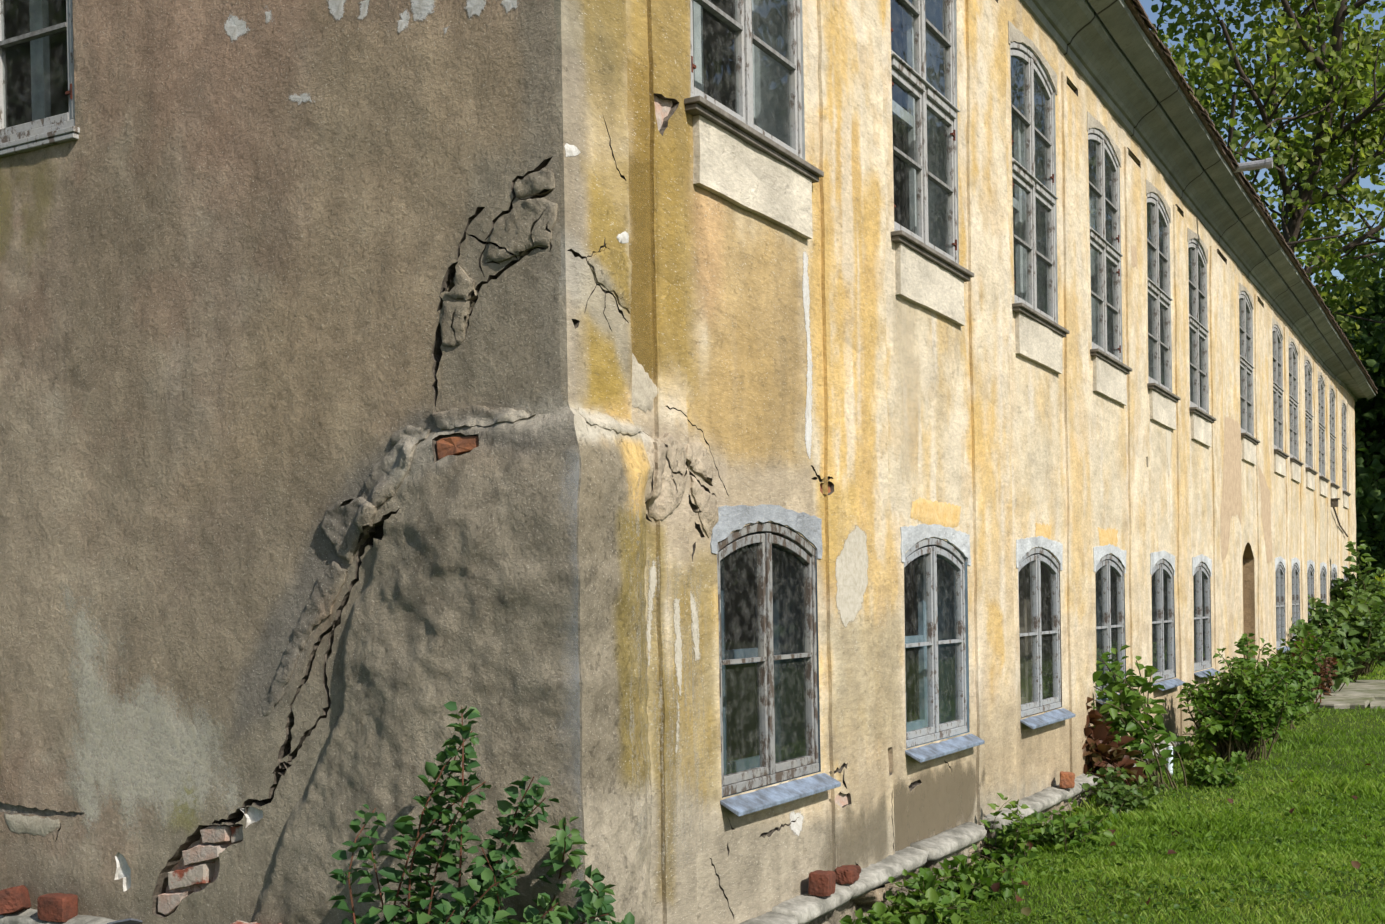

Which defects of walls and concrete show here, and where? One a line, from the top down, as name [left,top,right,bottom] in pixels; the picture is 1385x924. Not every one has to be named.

peeling [224,13,250,42]
peeling [327,0,370,20]
peeling [397,0,435,33]
peeling [464,0,518,18]
peeling [288,93,315,105]
spalling [654,94,679,136]
crack [431,158,629,406]
crack [643,405,729,562]
crack [212,501,399,827]
peeling [0,802,84,837]
spalling [152,806,263,918]